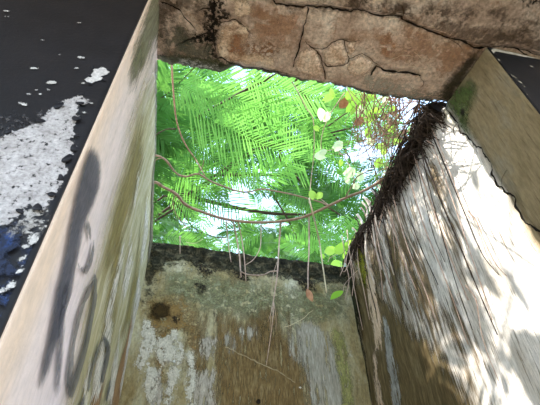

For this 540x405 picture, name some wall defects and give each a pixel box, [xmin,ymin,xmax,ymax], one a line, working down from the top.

peeling [79,65,111,85]
crack [160,0,537,85]
peeling [0,93,93,307]
damp [193,315,206,377]
damp [213,306,348,405]